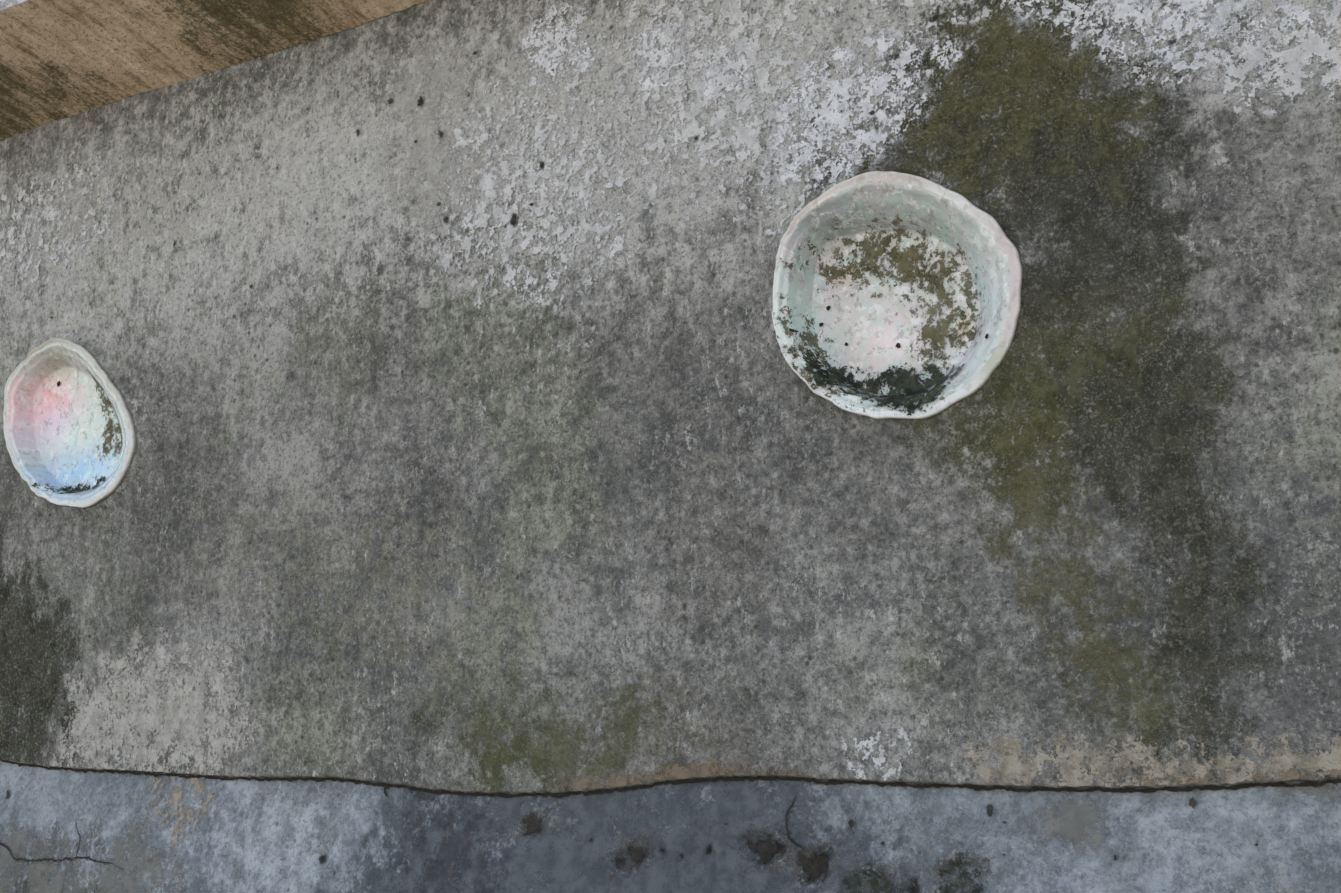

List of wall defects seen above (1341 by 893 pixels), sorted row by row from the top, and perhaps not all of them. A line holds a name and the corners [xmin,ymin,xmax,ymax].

leakage [956,329,1279,765]
leakage [0,576,256,775]
crack [0,821,124,870]
crack [0,759,1341,852]
spalling [963,732,1341,797]